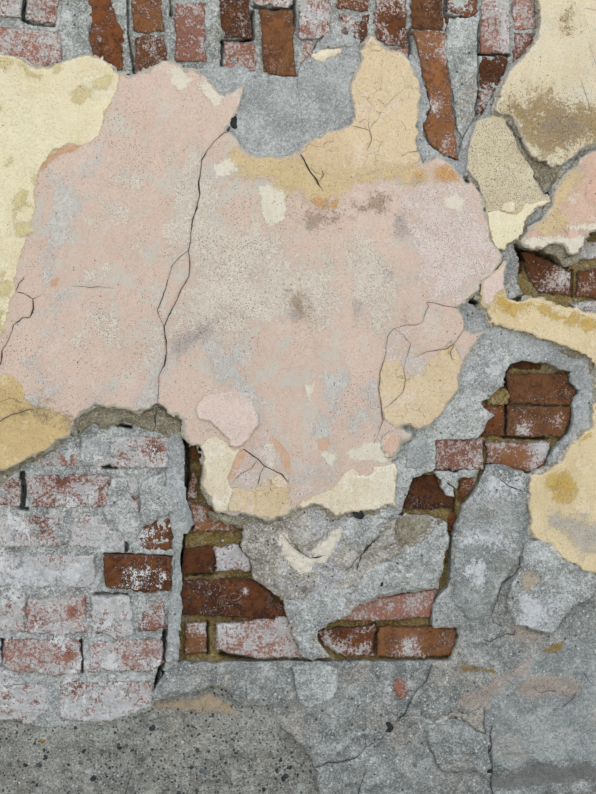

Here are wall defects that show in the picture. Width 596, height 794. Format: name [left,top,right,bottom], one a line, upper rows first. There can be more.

peeling [300,0,538,179]
crack [0,278,37,364]
crack [0,398,41,422]
crack [153,127,230,432]
peeling [0,0,448,728]
peeling [83,136,570,538]
peeling [487,201,596,307]